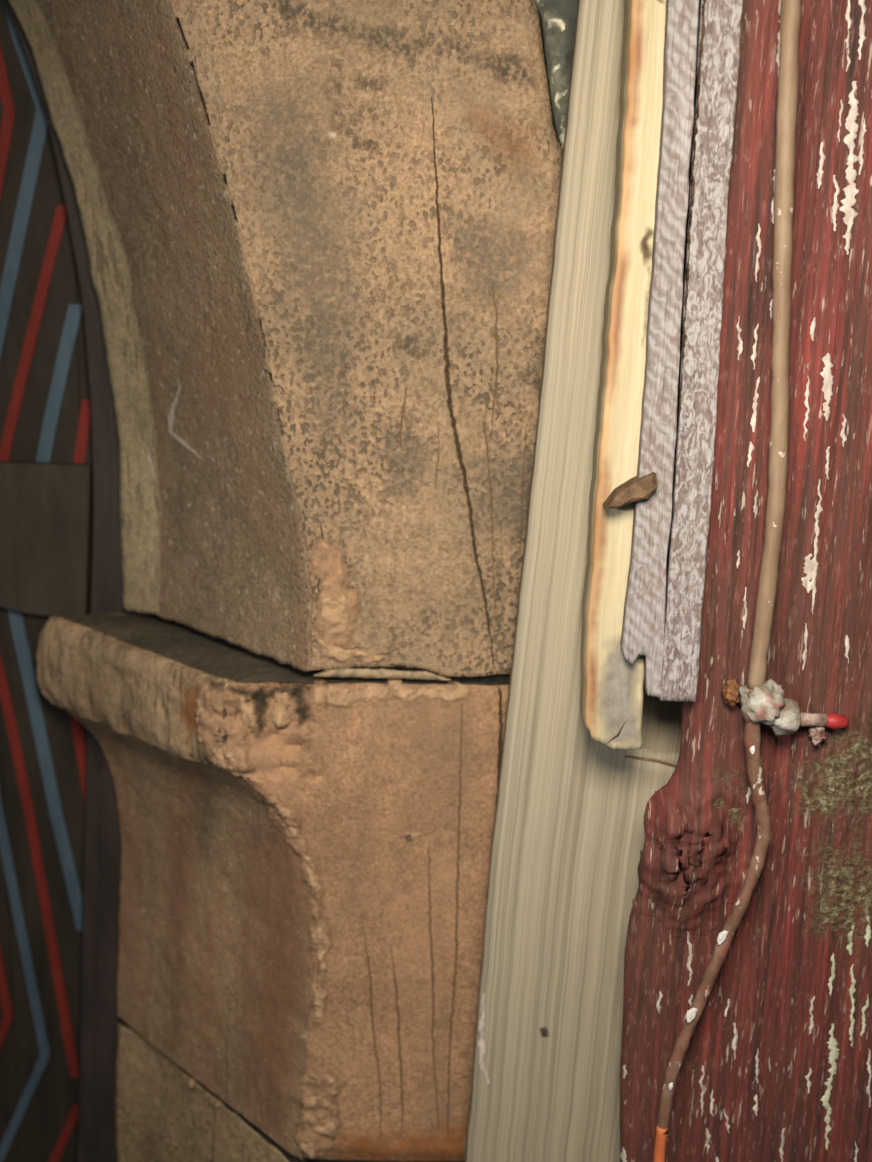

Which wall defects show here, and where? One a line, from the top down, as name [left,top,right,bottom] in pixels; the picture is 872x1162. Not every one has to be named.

peeling [755,169,775,282]
peeling [816,0,867,255]
spalling [312,539,383,663]
crack [399,387,407,450]
crack [431,99,526,803]
peeling [736,296,773,467]
peeling [801,353,847,670]
spalling [195,683,333,1025]
crack [364,930,403,1137]
crack [428,704,463,1138]
peeling [699,1065,730,1162]
peeling [805,907,872,1150]